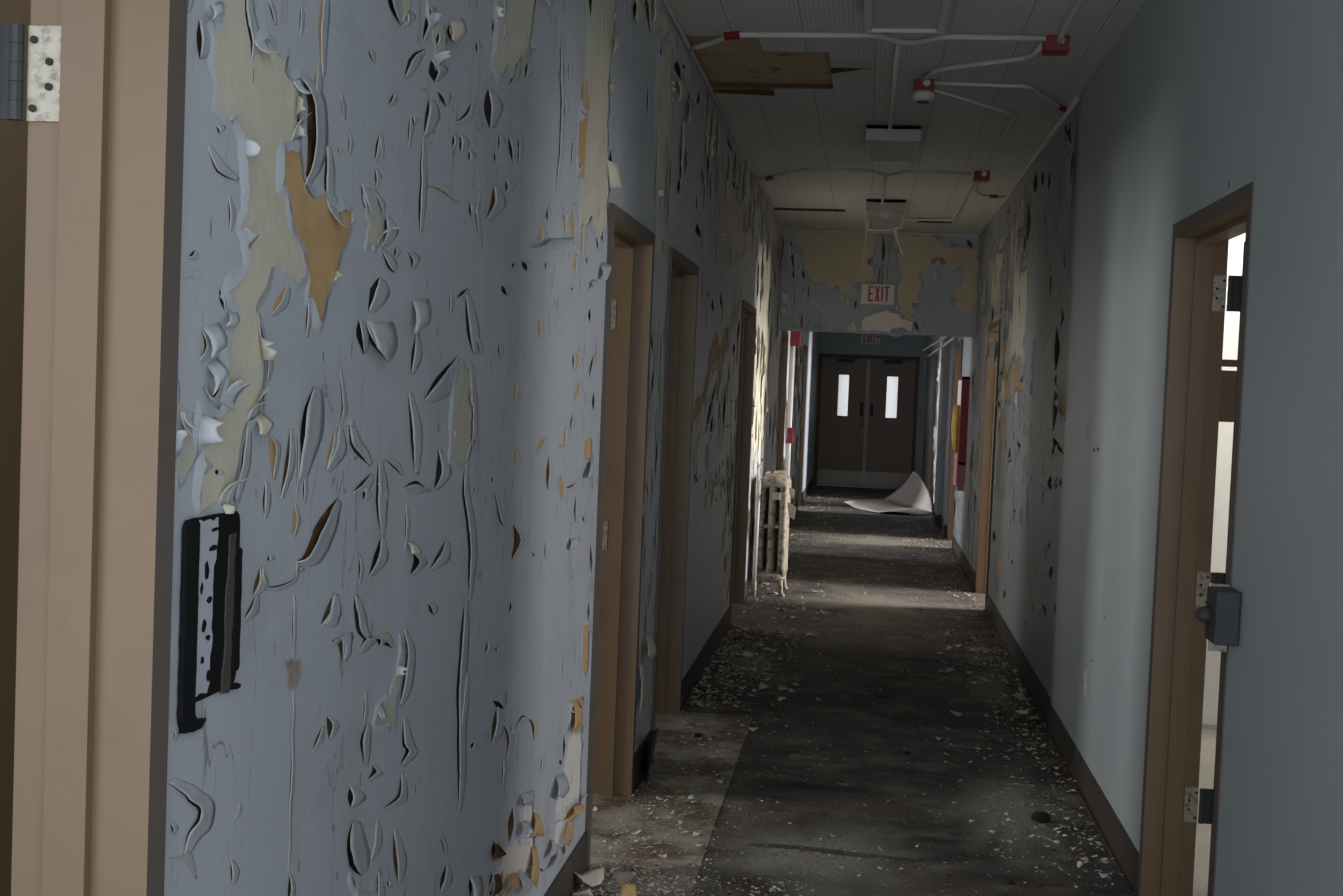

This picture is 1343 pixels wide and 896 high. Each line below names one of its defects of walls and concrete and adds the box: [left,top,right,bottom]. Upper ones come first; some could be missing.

peeling [539,0,622,280]
peeling [175,0,553,811]
peeling [515,420,597,503]
peeling [635,310,668,742]
peeling [633,0,805,612]
peeling [932,349,941,505]
peeling [169,778,216,879]
peeling [288,861,300,896]
peeling [321,592,419,896]
peeling [440,864,453,893]
peeling [469,622,591,896]